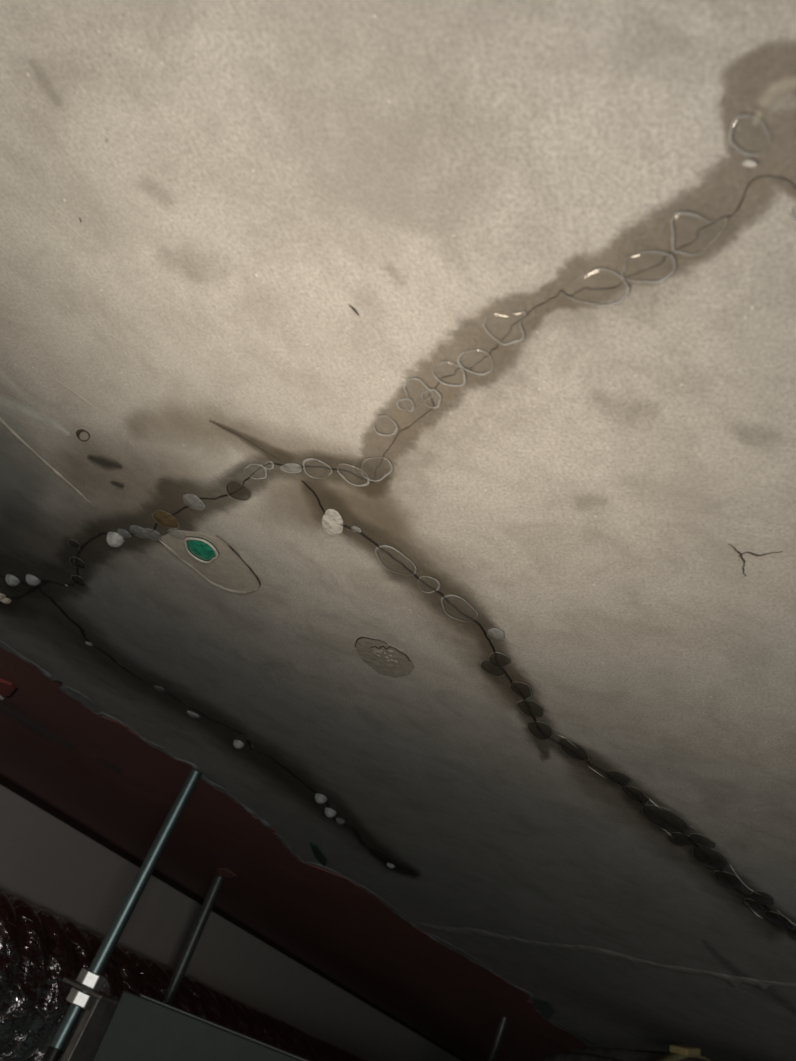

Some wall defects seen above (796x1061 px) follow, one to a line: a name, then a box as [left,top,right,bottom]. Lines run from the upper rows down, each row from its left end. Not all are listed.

spalling [355,636,414,678]
damp [0,48,796,876]
crack [0,176,796,937]